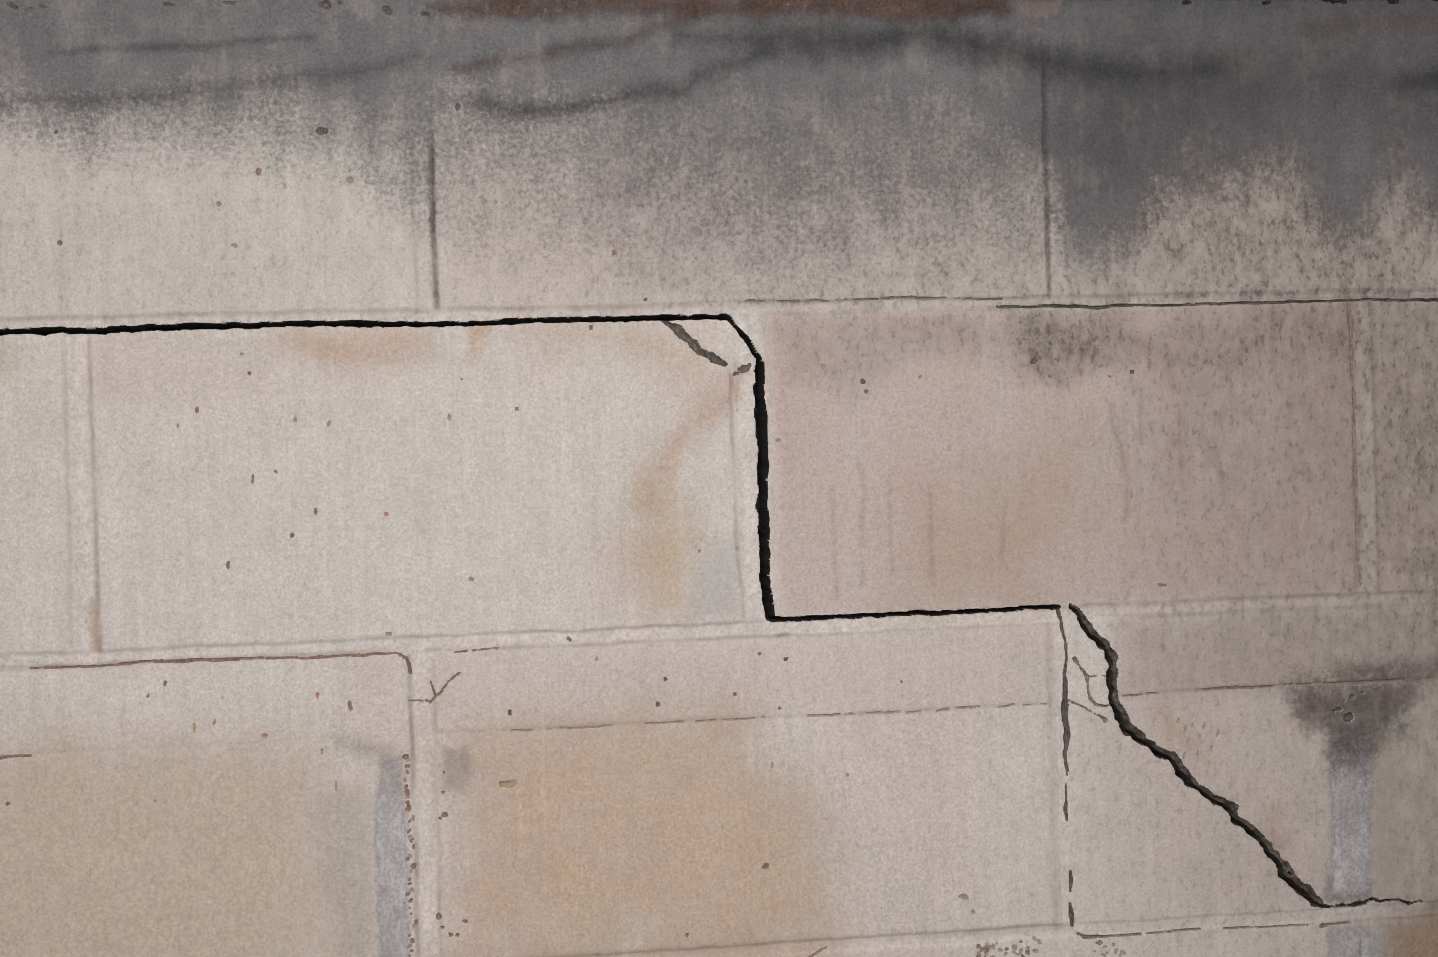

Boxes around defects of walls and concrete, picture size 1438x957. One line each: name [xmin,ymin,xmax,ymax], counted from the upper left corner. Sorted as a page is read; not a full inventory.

damp [439,0,1008,52]
crack [0,295,1438,939]
damp [1294,670,1408,765]